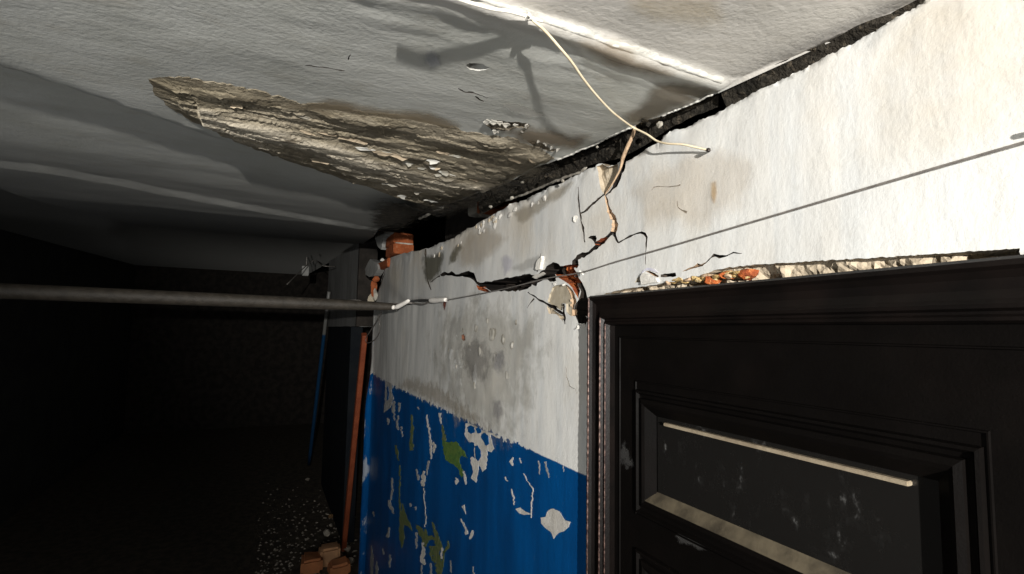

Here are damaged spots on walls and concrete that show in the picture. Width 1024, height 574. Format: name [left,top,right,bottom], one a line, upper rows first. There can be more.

flaking render [149,76,560,207]
flaking render [475,207,517,235]
crack [424,188,648,329]
flaking render [605,248,1020,294]
peeling [370,380,499,574]
peeling [505,457,570,539]